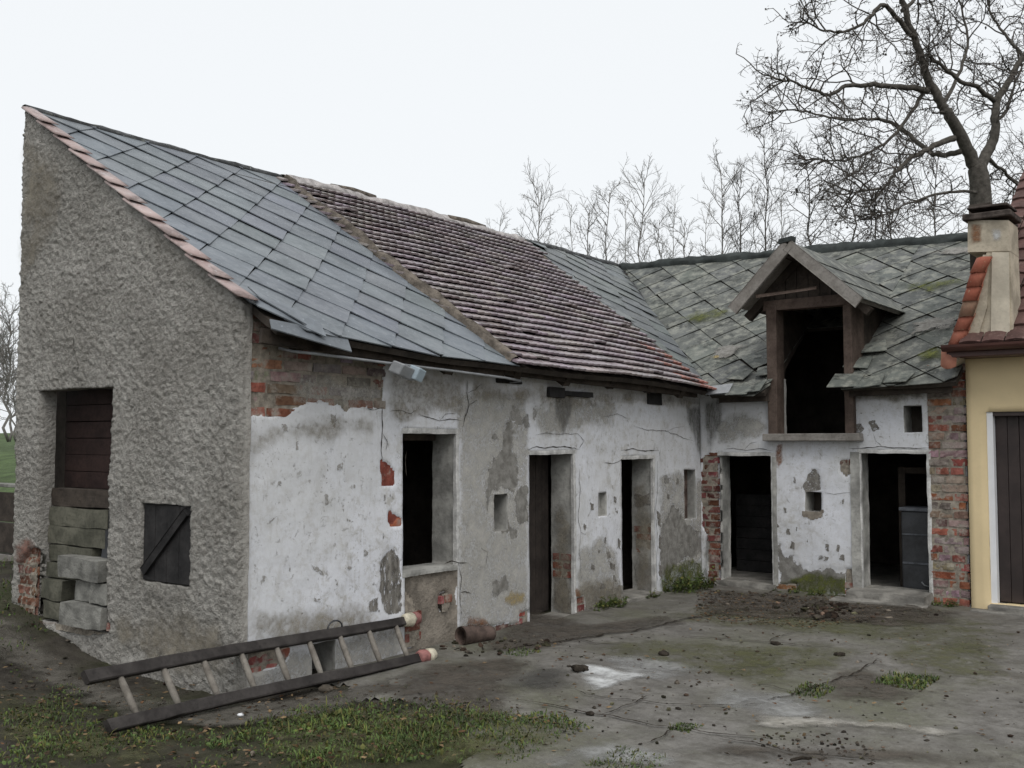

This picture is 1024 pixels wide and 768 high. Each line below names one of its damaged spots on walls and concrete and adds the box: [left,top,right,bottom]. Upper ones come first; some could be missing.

flaking render [251,315,386,431]
flaking render [380,460,401,538]
crack [370,383,480,475]
crack [605,414,688,464]
flaking render [634,452,721,591]
spalling [793,469,821,492]
spalling [802,510,824,520]
flaking render [840,459,851,477]
flaking render [18,548,41,614]
peeling [335,549,422,667]
leakage [492,514,673,649]
peeling [247,647,312,688]